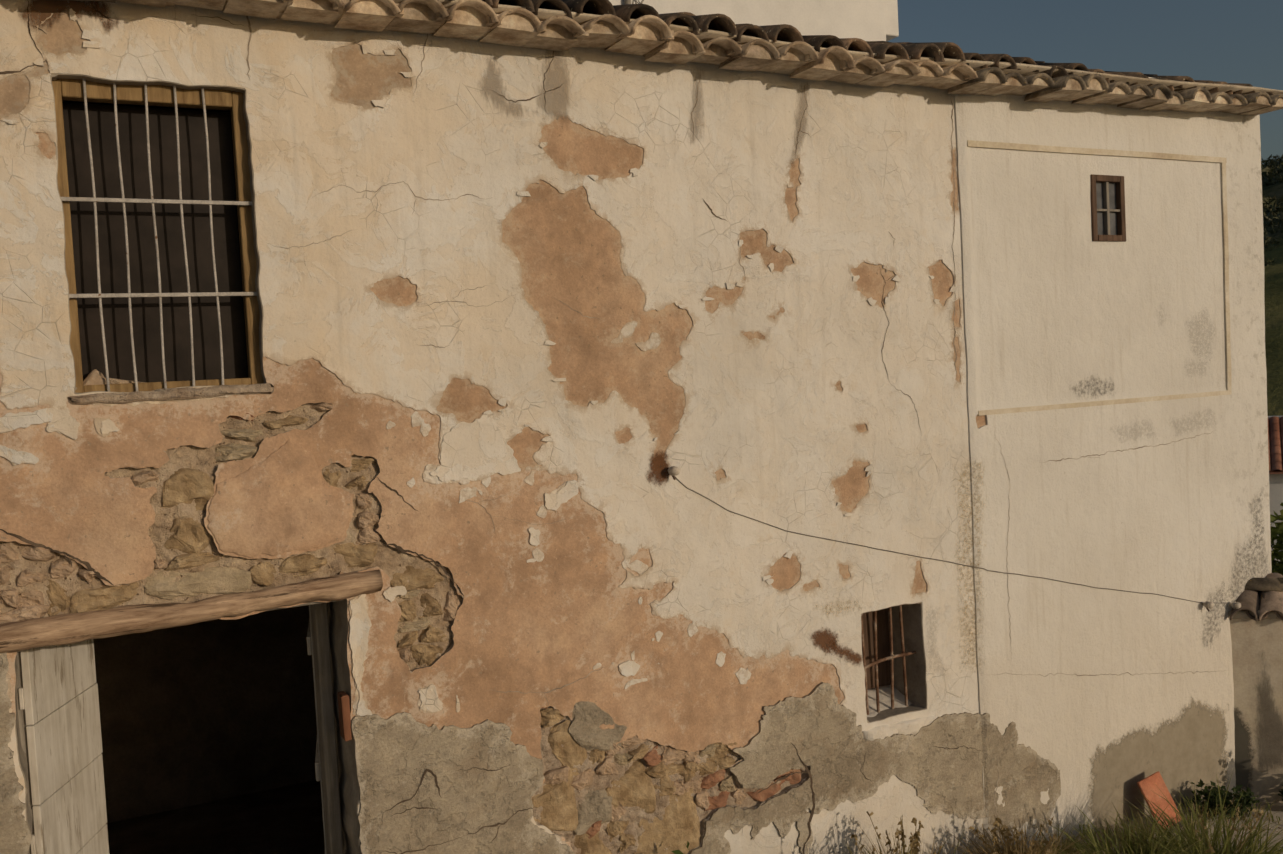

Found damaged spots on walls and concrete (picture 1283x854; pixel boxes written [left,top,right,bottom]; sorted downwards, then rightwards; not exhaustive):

crack [0,1,45,74]
peeling [370,276,417,306]
peeling [502,116,745,458]
peeling [739,229,793,272]
peeling [928,260,960,382]
crack [950,101,958,377]
peeling [831,460,874,516]
peeling [0,357,845,770]
crack [382,765,514,818]
crack [386,807,536,854]
crack [757,743,815,854]
water stain [1089,699,1254,828]